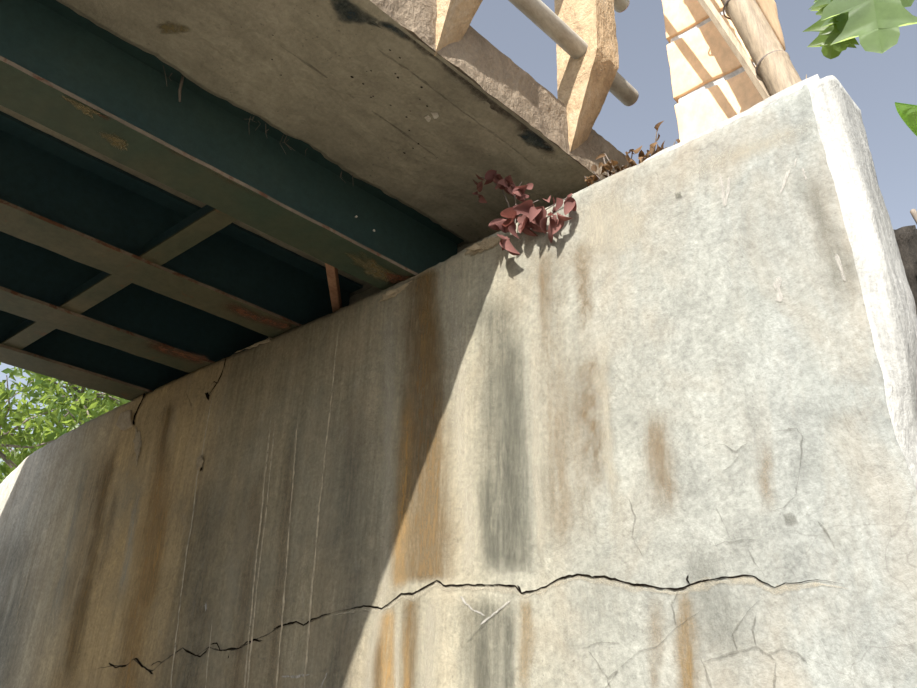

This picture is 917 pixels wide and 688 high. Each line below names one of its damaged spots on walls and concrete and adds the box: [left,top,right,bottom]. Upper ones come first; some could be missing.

leakage [334,0,404,37]
crack [205,358,226,401]
crack [116,393,145,467]
rust [396,274,446,581]
leakage [486,315,517,561]
rust [374,615,394,688]
rust [405,601,415,688]
crack [98,574,836,674]